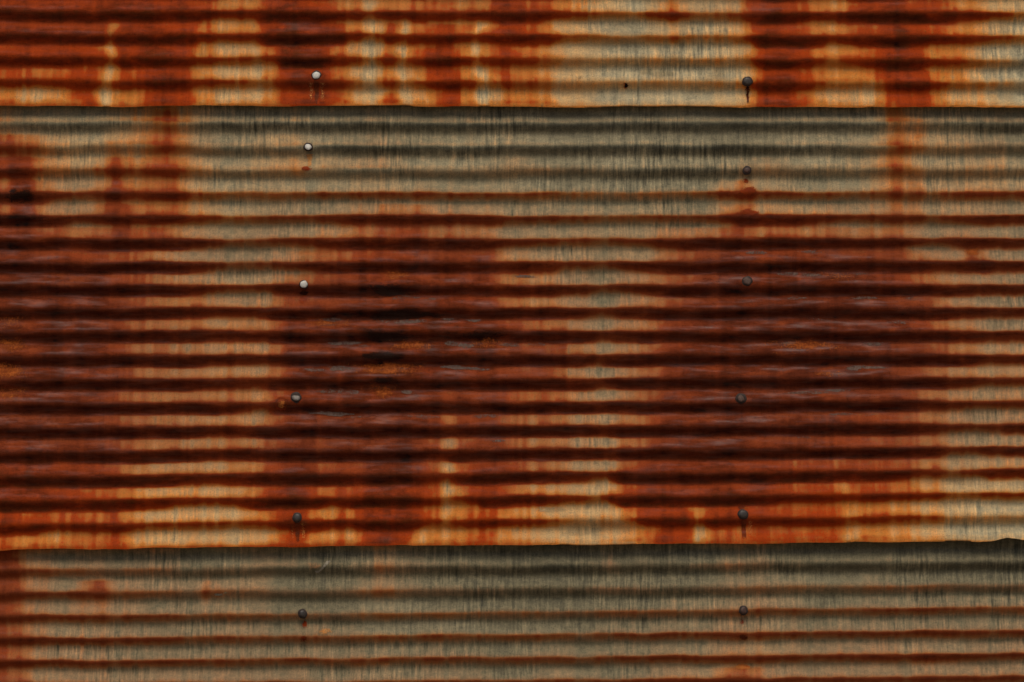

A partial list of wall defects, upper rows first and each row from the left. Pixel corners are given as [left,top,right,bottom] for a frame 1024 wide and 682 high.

corrosion [366,362,410,375]
corrosion [261,499,571,547]
corrosion [599,496,957,544]
corrosion [0,549,1024,682]